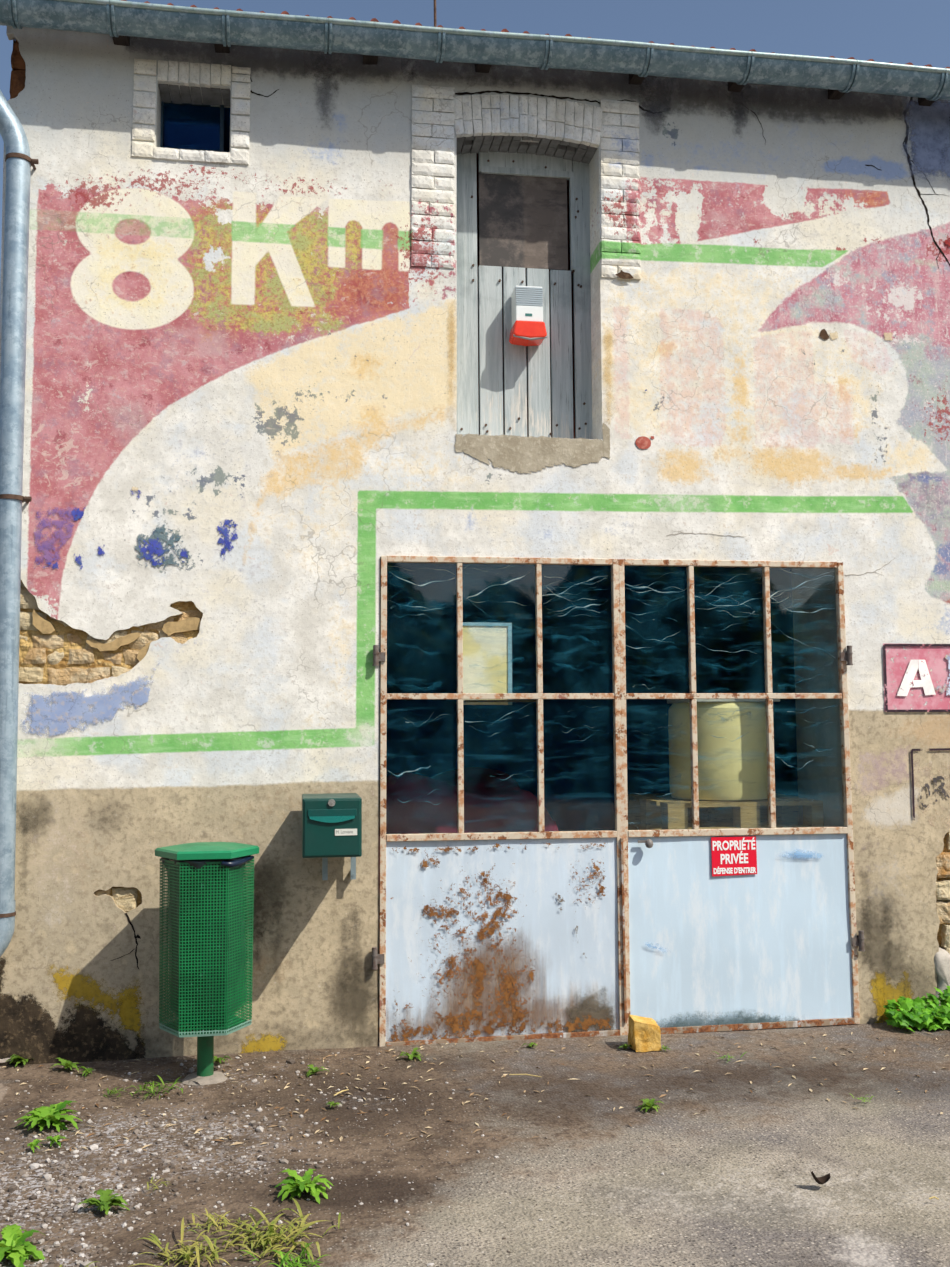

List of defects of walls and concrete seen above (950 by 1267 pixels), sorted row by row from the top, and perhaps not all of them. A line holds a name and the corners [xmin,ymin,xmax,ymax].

leakage [131,37,903,129]
crack [866,97,950,268]
flaking render [19,580,203,736]
flaking render [94,886,142,912]
rust [392,843,526,869]
rust [390,865,614,1042]
rust [555,843,607,910]
flaking render [934,831,950,1006]
leakage [0,958,145,1066]